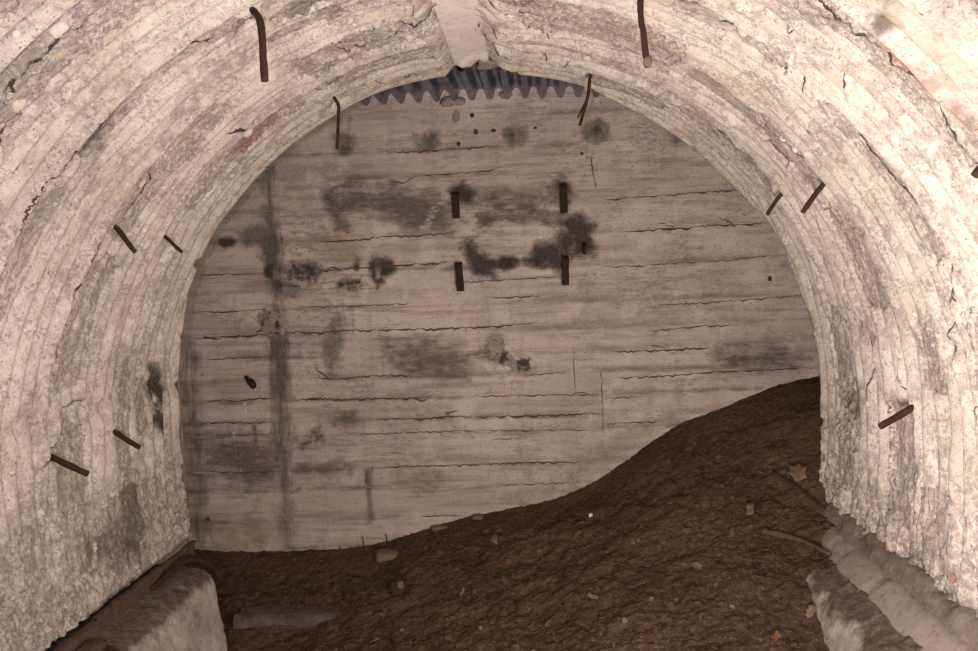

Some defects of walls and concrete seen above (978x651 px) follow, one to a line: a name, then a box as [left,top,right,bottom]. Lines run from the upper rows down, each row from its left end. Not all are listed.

spalling [74,0,413,157]
spalling [289,9,444,149]
spalling [512,0,826,216]
damp [219,172,321,317]
damp [337,258,395,289]
damp [324,179,448,229]
damp [563,213,595,249]
spalling [825,203,892,310]